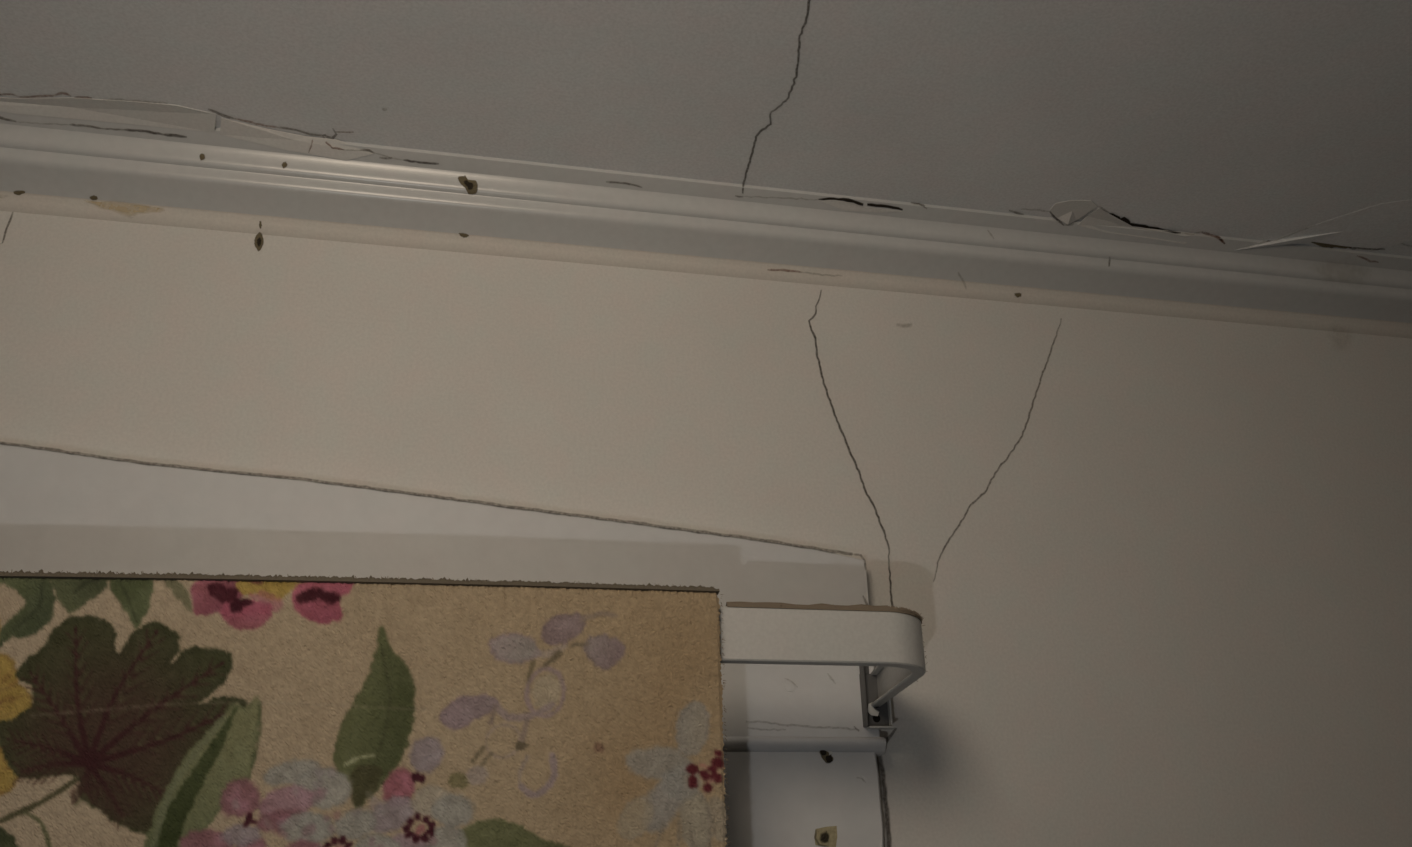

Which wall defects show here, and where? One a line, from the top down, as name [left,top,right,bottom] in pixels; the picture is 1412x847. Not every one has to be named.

crack [737,0,810,197]
crack [937,341,1055,564]